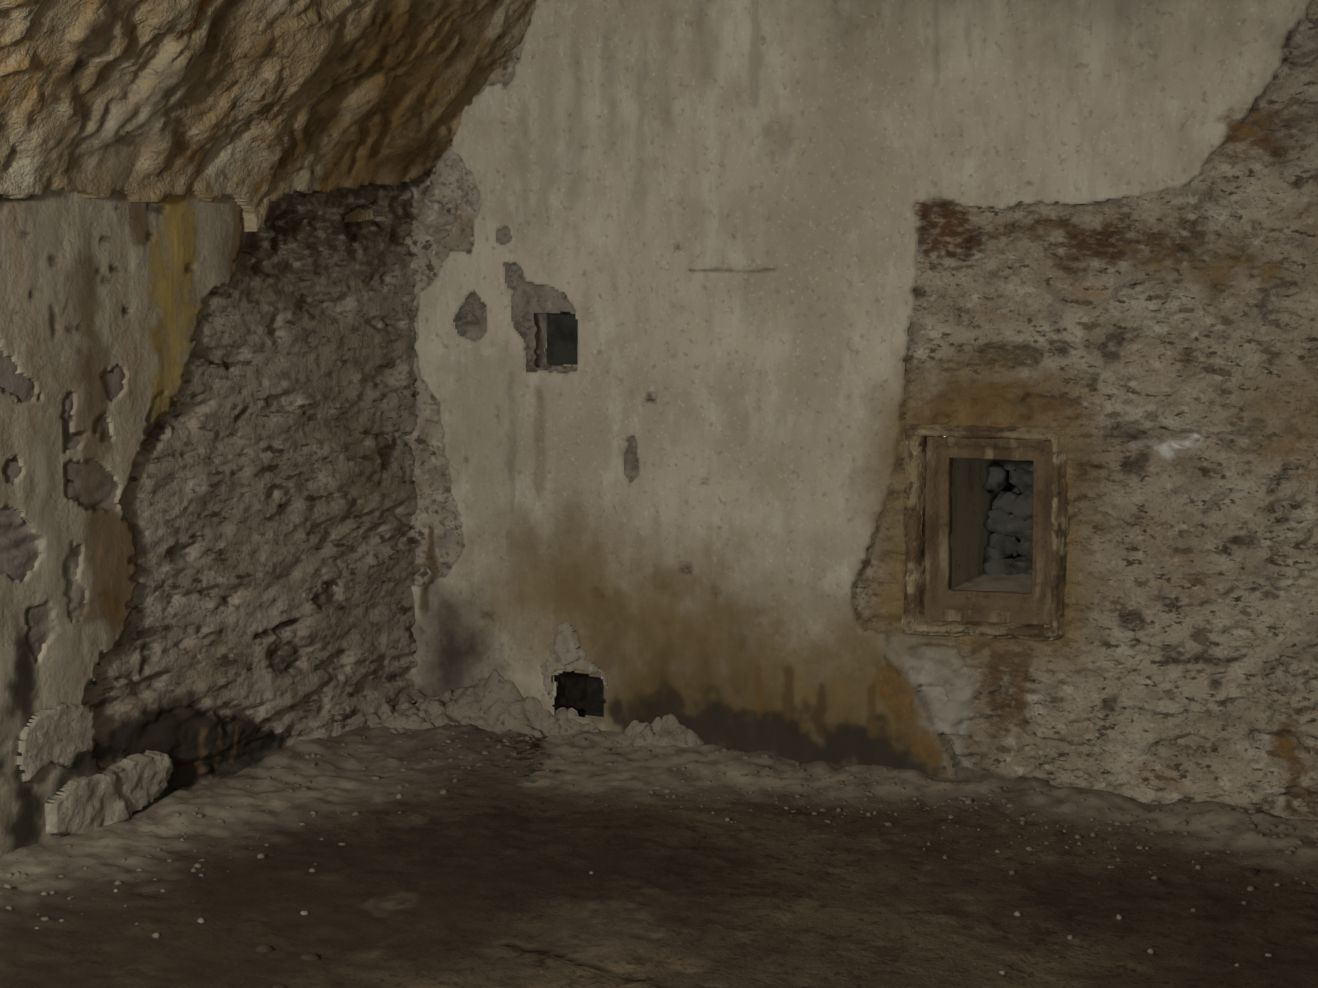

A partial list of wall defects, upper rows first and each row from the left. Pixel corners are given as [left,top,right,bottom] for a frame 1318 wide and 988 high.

flaking render [467,35,525,106]
flaking render [453,290,487,342]
flaking render [503,262,578,374]
flaking render [0,350,40,402]
flaking render [61,364,125,452]
flaking render [851,0,1318,820]
flaking render [83,146,481,785]
flaking render [0,507,42,582]
flaking render [26,542,85,663]
water stain [422,531,436,608]
water stain [431,605,480,692]
water stain [553,567,947,778]